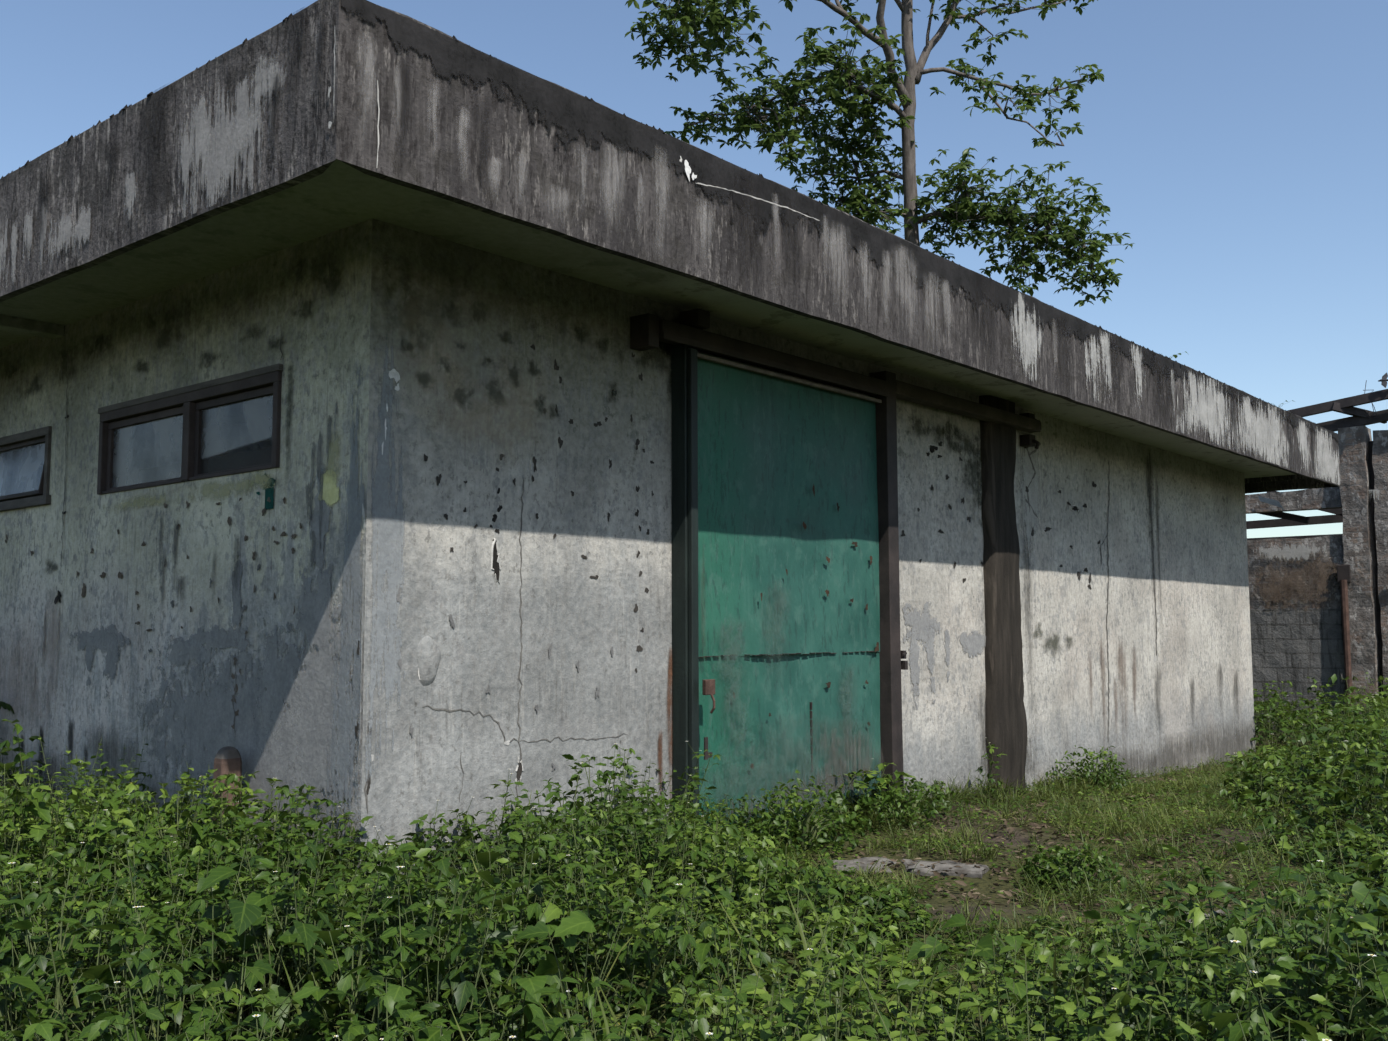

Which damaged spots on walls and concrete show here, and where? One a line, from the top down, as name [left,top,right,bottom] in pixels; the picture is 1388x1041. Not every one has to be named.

leakage [271,13,325,128]
leakage [395,70,410,139]
leakage [460,112,499,183]
leakage [735,175,799,278]
leakage [885,251,950,323]
leakage [912,417,982,506]
spalling [444,454,537,584]
peeling [69,359,365,876]
crack [423,478,627,796]
peeling [901,602,986,716]
leakage [1024,544,1072,650]